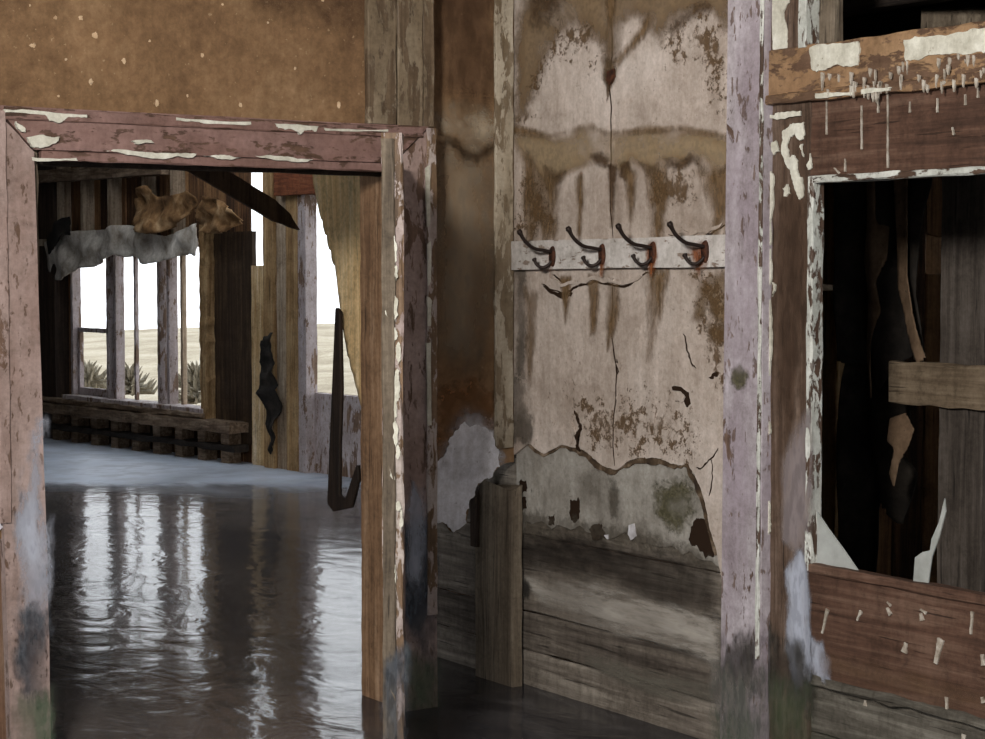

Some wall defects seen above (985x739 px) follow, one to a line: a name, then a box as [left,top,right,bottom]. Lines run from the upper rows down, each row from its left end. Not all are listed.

peeling [809,41,861,72]
peeling [903,28,985,61]
peeling [3,109,87,162]
crack [607,28,615,164]
damp [513,0,728,241]
damp [589,276,618,349]
damp [649,268,669,330]
damp [513,409,532,443]
crack [569,410,582,452]
crack [611,337,619,466]
peeling [437,409,501,532]
spalling [516,440,719,566]